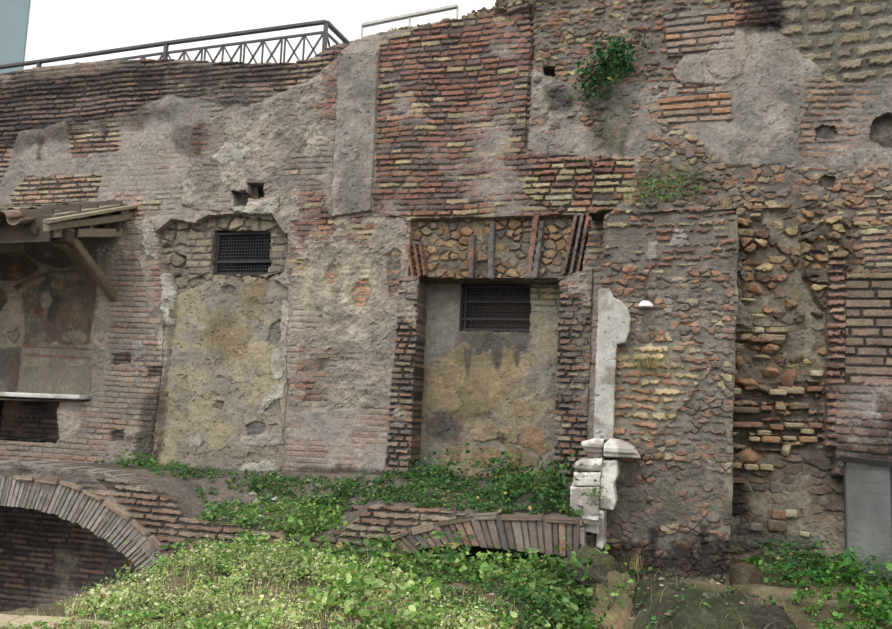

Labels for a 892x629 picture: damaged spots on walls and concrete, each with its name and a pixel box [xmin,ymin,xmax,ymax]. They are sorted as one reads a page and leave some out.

water stain [461,331,528,371]